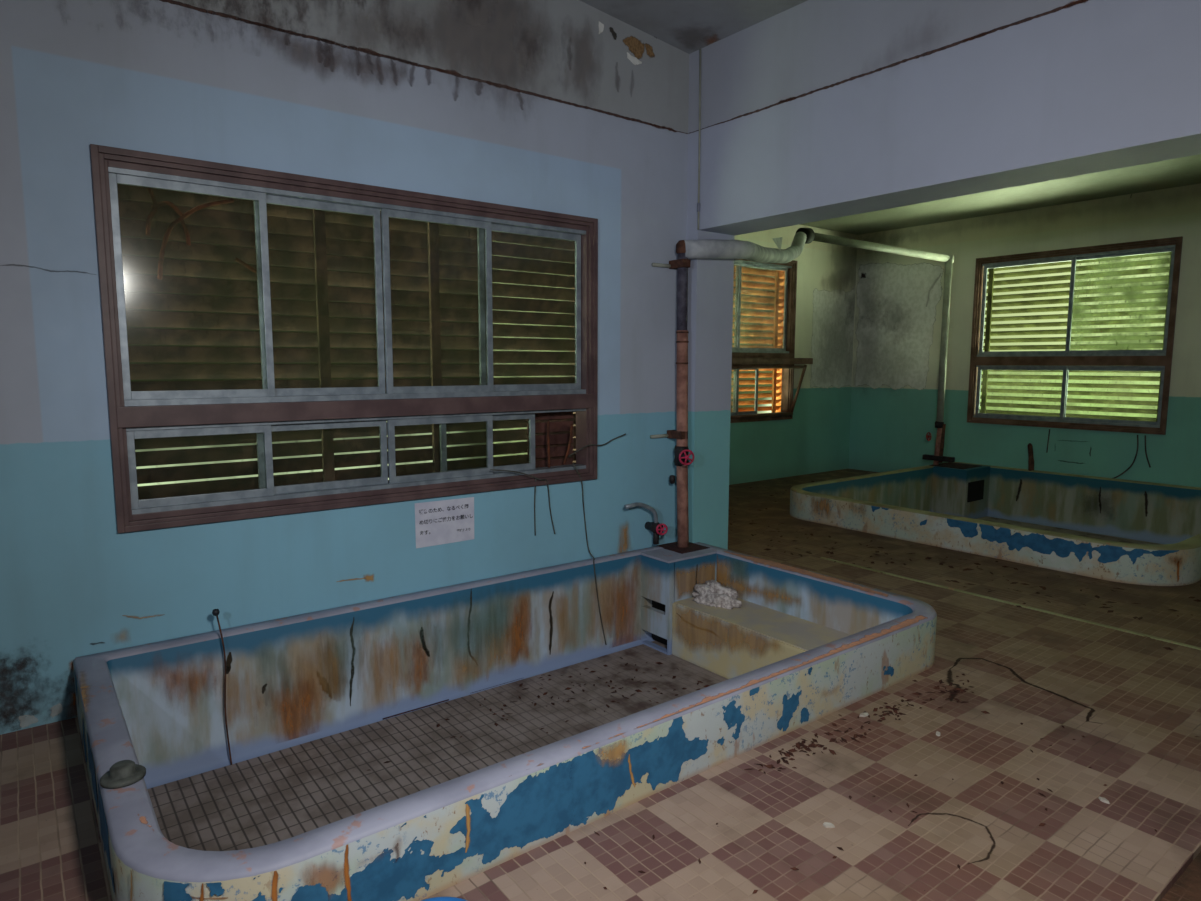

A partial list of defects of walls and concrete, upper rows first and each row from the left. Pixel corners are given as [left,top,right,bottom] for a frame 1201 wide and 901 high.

peeling [947,518,1179,564]
peeling [724,551,888,597]
corrosion [486,601,528,662]
damp [0,658,38,719]
corrosion [280,687,313,740]
peeling [74,670,115,892]